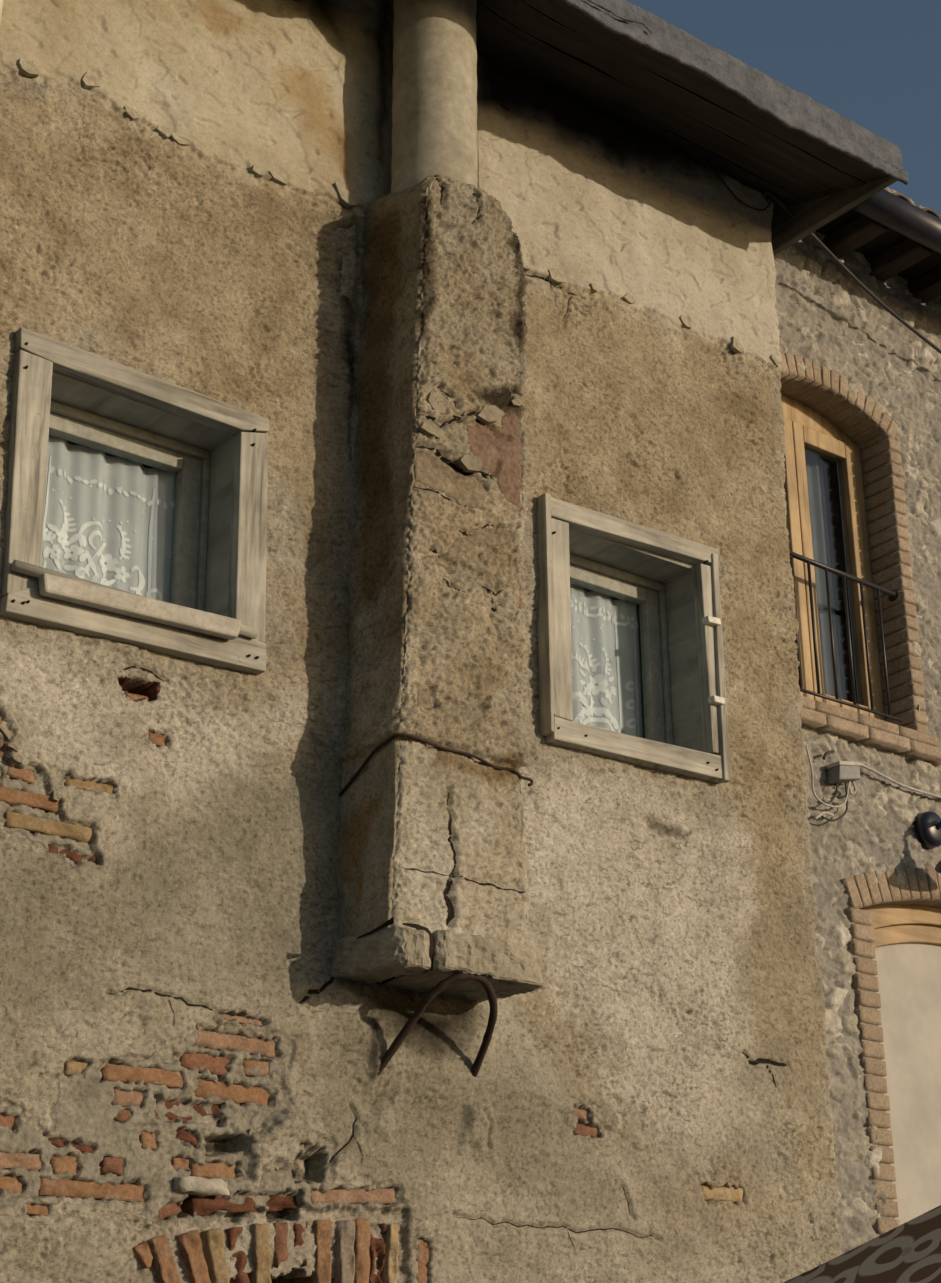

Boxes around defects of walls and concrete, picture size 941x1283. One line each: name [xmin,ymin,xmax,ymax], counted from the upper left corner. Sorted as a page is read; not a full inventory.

spalling [415,392,525,510]
spalling [118,676,161,702]
spalling [148,728,175,748]
spalling [0,716,115,868]
crack [357,792,525,984]
crack [108,987,216,1029]
crack [300,978,334,1003]
crack [742,1052,787,1087]
spalling [0,1009,405,1227]
crack [326,1106,363,1166]
spalling [565,1104,604,1138]
crack [455,1183,661,1247]